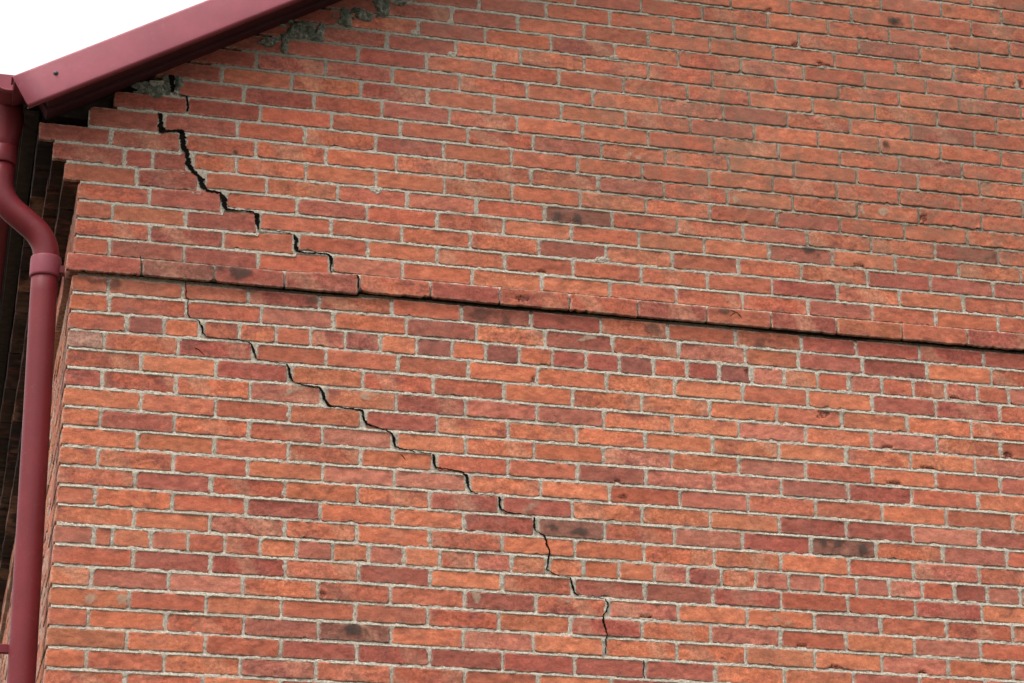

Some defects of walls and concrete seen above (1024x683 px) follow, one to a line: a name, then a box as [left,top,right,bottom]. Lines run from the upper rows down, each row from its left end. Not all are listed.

crack [66,75,1024,654]